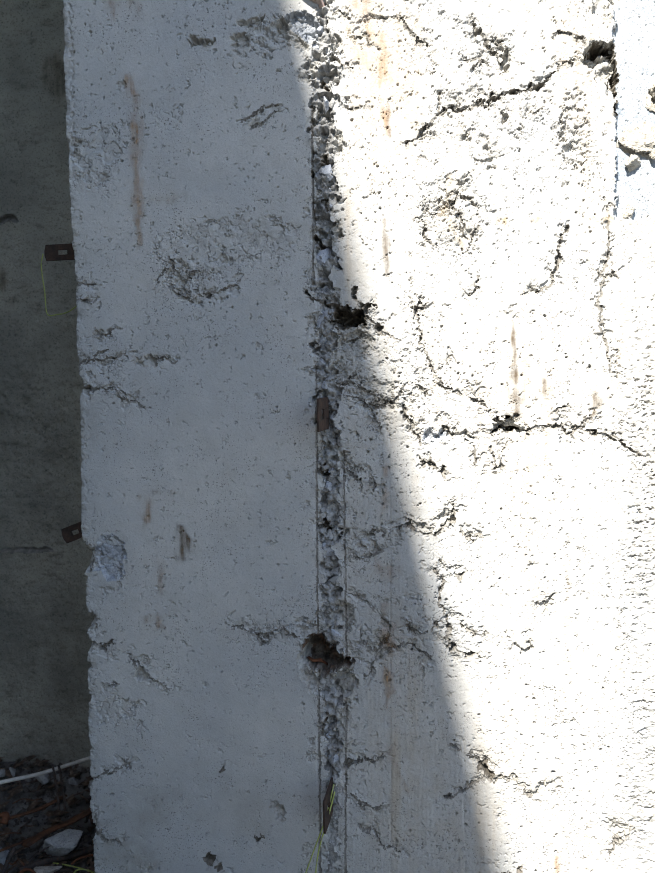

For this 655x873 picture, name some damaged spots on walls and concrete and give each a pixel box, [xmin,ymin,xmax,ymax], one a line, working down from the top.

crack [332,0,429,51]
spalling [332,129,349,161]
crack [405,29,587,147]
peeling [558,103,598,175]
flaking render [580,0,655,221]
spalling [331,218,345,244]
spalling [329,325,374,386]
crack [346,298,491,478]
crack [522,403,642,456]
crack [388,503,484,543]
spalling [85,533,128,582]
crack [443,739,533,799]